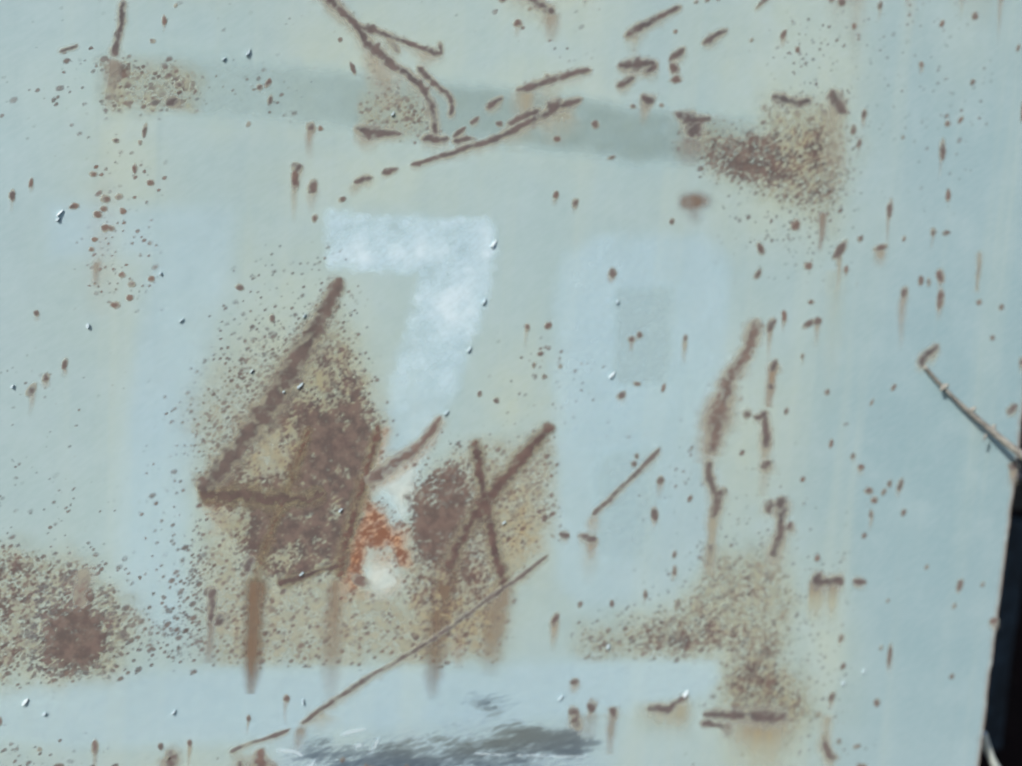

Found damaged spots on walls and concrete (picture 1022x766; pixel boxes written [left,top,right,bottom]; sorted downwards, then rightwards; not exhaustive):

corrosion [59,44,93,74]
corrosion [91,0,217,145]
corrosion [780,29,844,75]
corrosion [306,122,323,139]
corrosion [675,89,867,274]
corrosion [874,244,887,258]
corrosion [0,274,562,689]
corrosion [577,528,867,753]
corrosion [568,698,597,731]
corrosion [158,739,192,766]
corrosion [237,748,276,766]